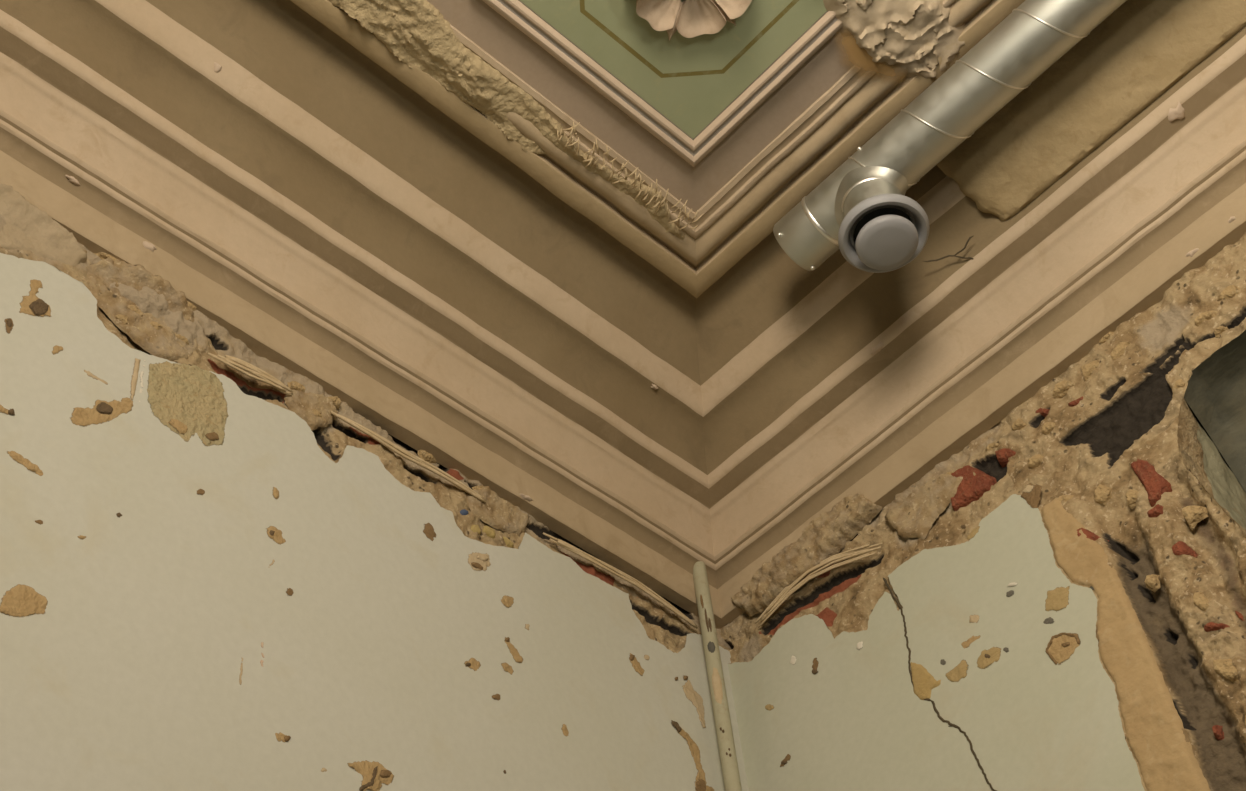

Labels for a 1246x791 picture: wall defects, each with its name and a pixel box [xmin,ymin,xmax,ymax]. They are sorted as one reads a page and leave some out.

flaking render [0,214,1246,791]
crack [883,578,997,791]